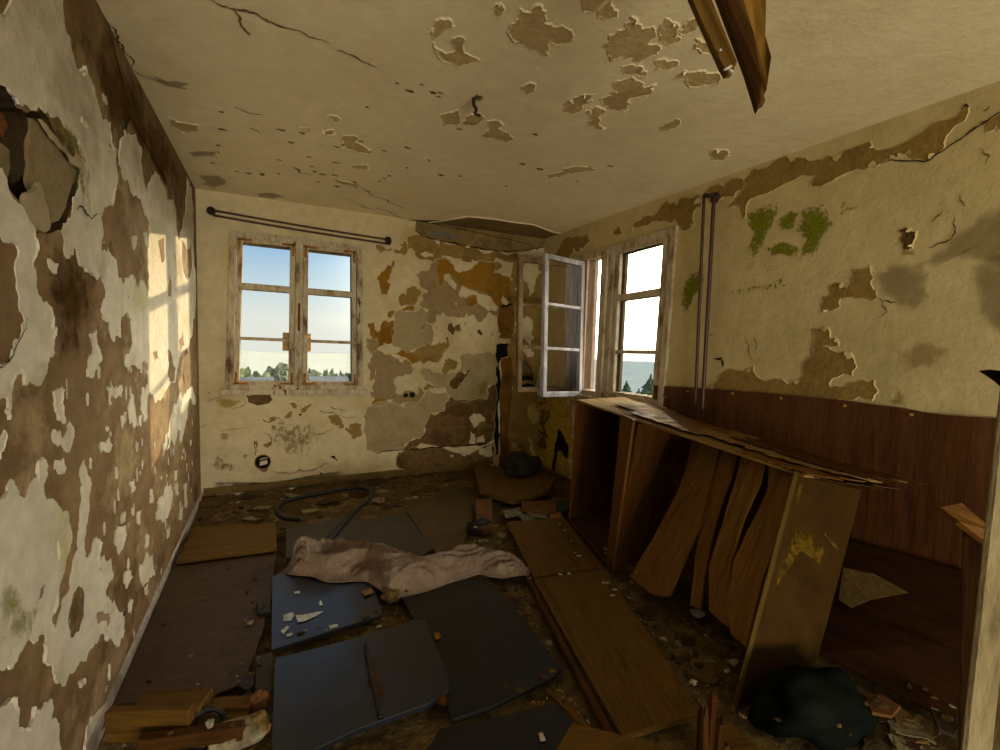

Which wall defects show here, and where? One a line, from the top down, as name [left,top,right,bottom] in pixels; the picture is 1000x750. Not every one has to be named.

crack [211,0,375,67]
peeling [492,2,576,57]
peeling [559,0,722,131]
crack [874,104,1000,167]
peeling [613,104,970,236]
damp [747,204,833,256]
peeling [898,226,919,252]
peeling [820,265,878,313]
peeling [0,0,201,688]
peeling [366,216,590,456]
peeling [708,326,879,402]
peeling [0,697,62,750]